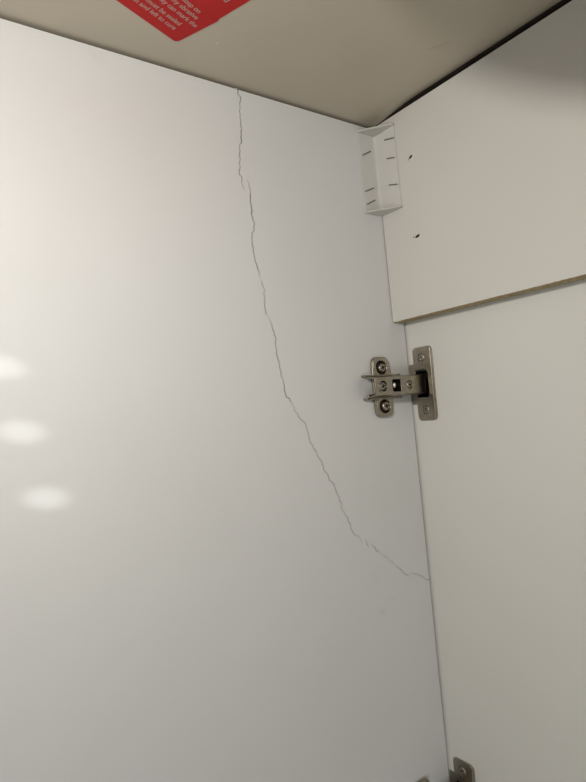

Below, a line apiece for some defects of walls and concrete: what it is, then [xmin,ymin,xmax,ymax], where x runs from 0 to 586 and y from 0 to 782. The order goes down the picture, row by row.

crack [236,88,430,582]